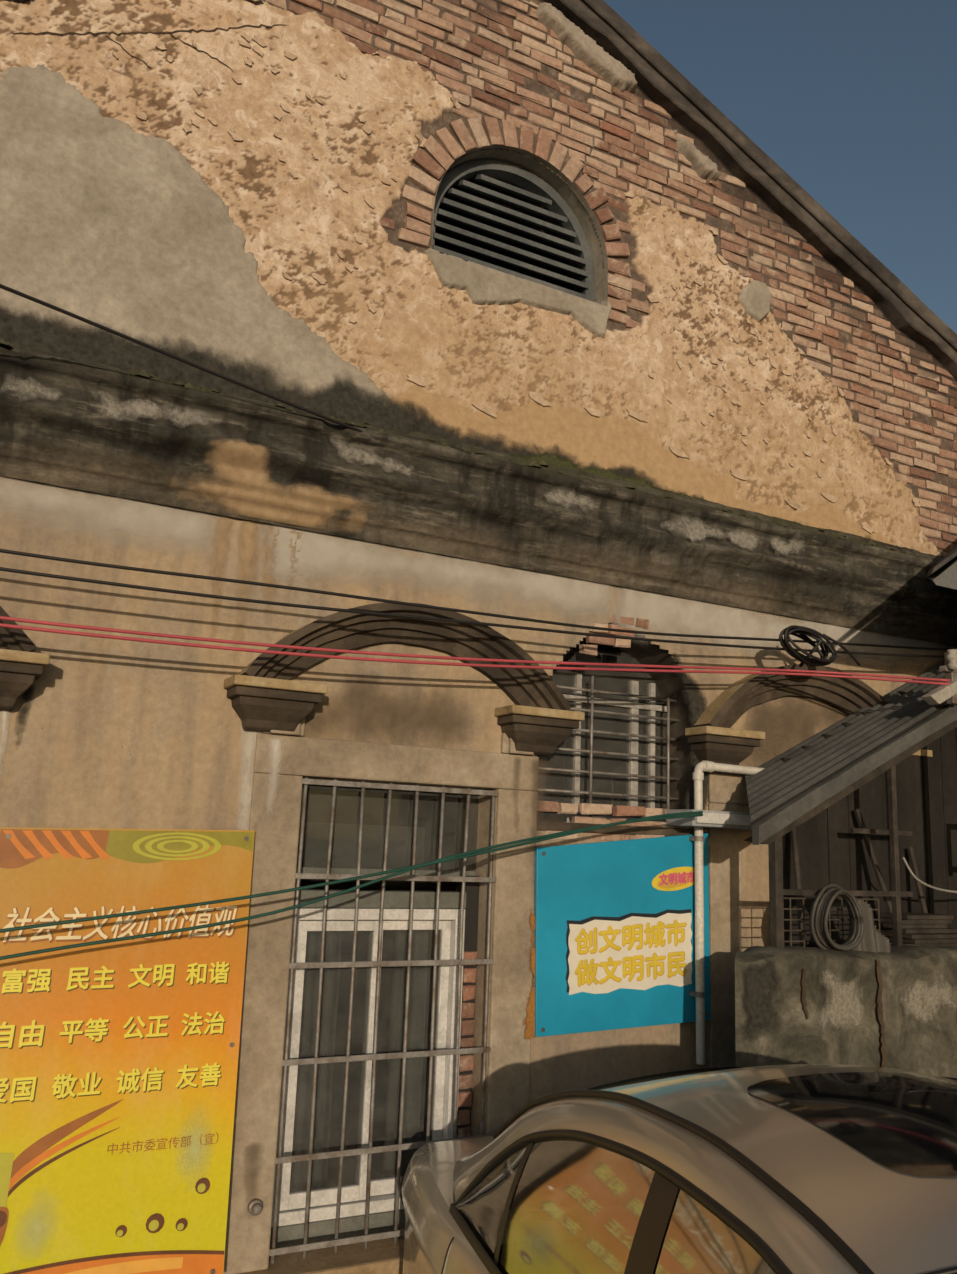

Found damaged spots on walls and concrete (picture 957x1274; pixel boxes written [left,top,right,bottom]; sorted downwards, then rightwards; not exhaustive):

crack [12,24,283,71]
flaking render [238,32,267,66]
spalling [251,0,957,556]
peeling [8,381,59,399]
peeling [102,394,217,425]
damp [0,306,711,503]
damp [0,483,207,542]
damp [0,606,36,652]
flaking render [579,614,649,657]
damp [0,685,34,753]